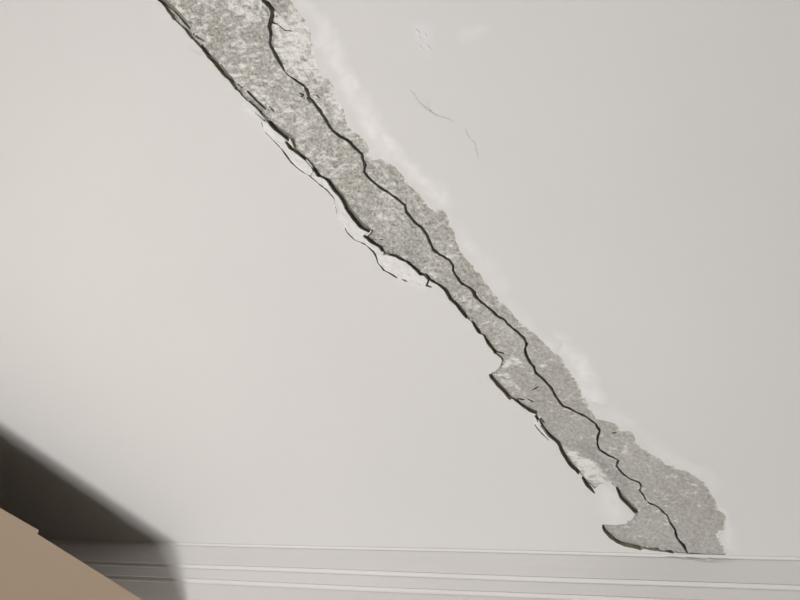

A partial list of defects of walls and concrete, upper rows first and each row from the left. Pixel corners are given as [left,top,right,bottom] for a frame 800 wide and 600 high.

spalling [158,0,743,555]
crack [261,0,687,551]